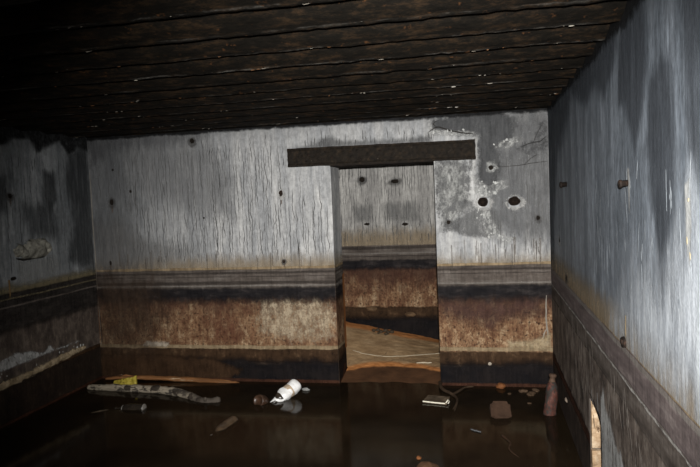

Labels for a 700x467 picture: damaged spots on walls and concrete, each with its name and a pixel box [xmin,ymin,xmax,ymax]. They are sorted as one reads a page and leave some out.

peeling [429,113,519,244]
water stain [489,92,570,256]
water stain [648,62,674,250]
rust [98,267,590,444]
water stain [0,136,700,467]